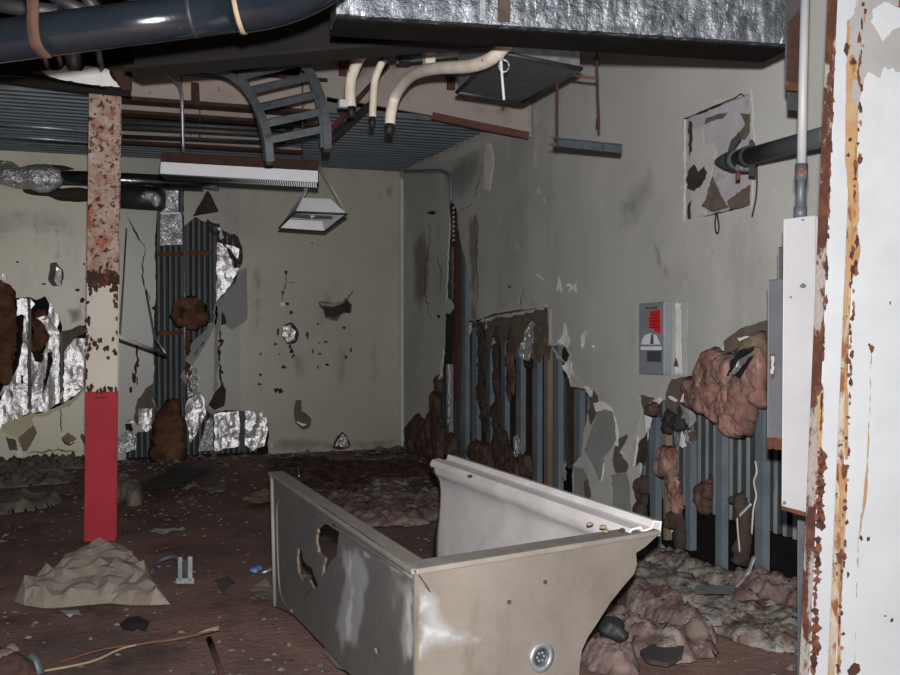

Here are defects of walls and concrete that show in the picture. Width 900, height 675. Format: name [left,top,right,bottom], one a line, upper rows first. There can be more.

spalling [42,262,64,286]
peeling [42,65,122,275]
rust [84,262,120,394]
crack [127,217,150,299]
spalling [180,219,248,393]
spalling [317,291,353,329]
spalling [470,302,593,397]
rust [781,0,861,675]
peeling [830,0,900,425]
peeling [808,447,828,675]
peeling [835,436,851,674]
rust [859,424,870,541]